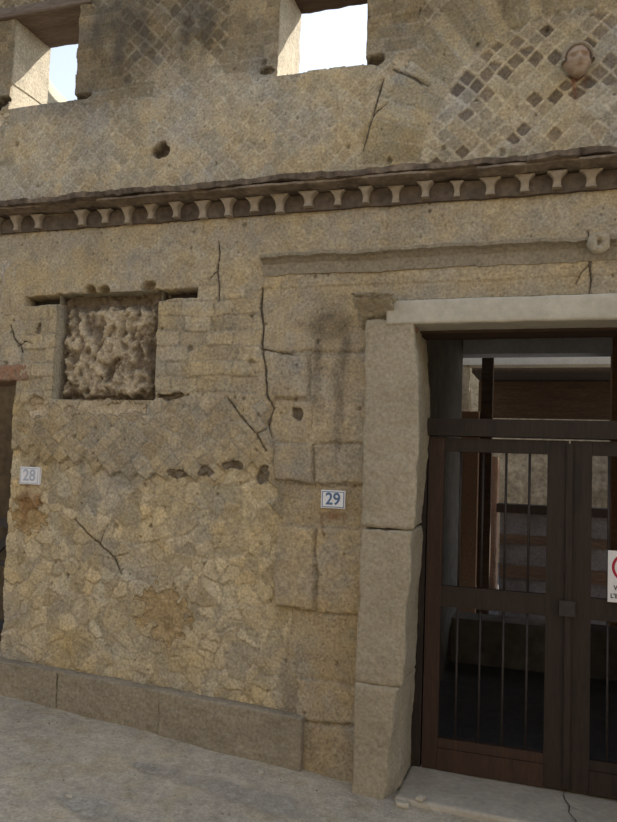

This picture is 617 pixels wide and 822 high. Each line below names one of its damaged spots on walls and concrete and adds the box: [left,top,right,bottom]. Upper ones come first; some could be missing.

crack [363,69,428,150]
crack [576,261,592,293]
crack [74,519,125,574]